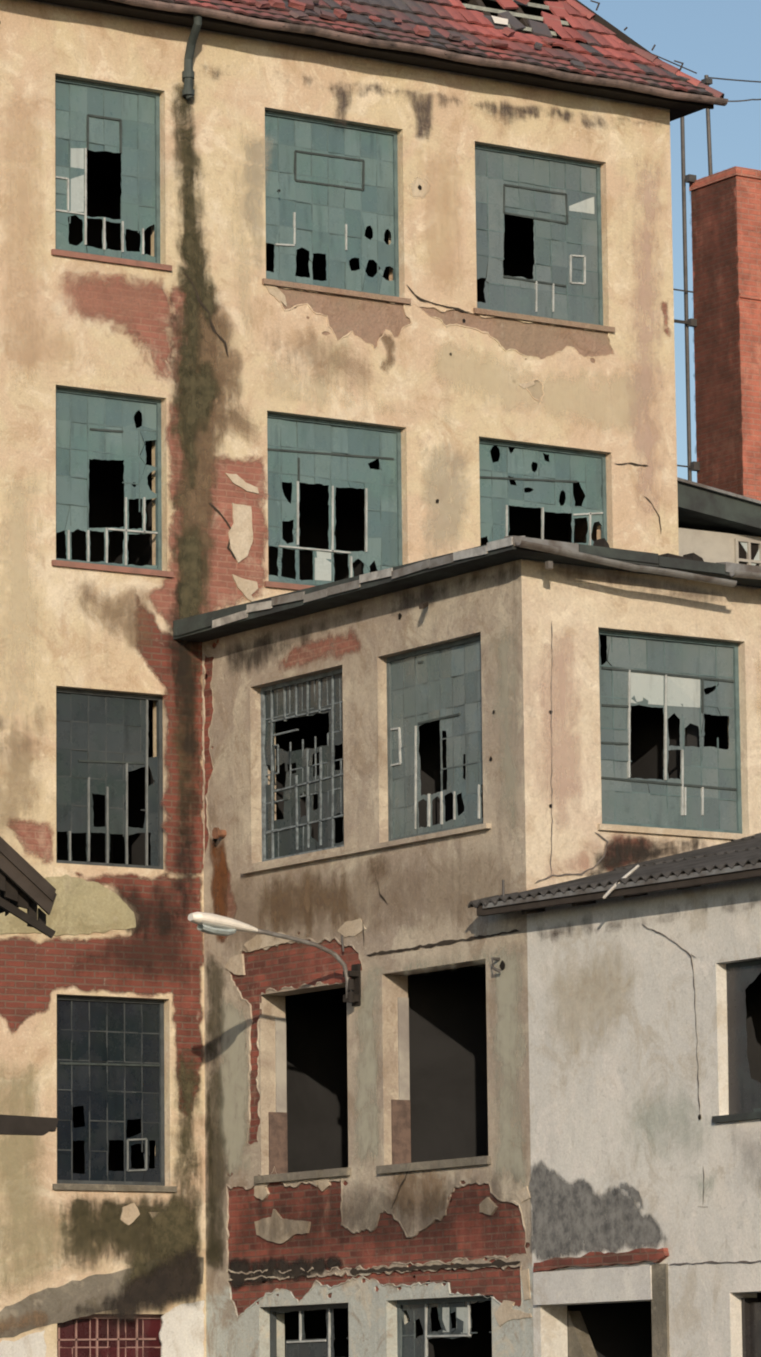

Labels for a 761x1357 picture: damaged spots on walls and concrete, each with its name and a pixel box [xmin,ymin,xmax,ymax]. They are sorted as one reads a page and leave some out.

damp [178,131,249,619]
peeling [265,285,615,363]
spalling [198,456,268,614]
spalling [0,275,219,1116]
spalling [279,631,361,669]
peeling [225,872,237,919]
spalling [225,918,366,1145]
crack [642,924,700,1116]
damp [62,1201,167,1262]
spalling [226,1166,532,1326]